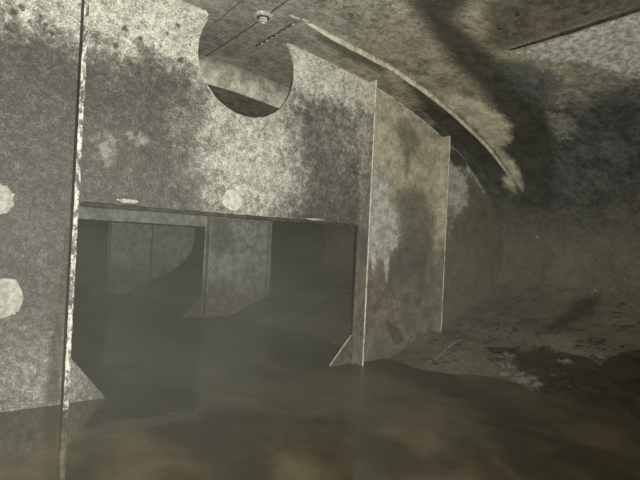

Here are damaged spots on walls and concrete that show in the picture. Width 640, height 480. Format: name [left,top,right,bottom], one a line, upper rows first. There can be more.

damp [324,39,382,71]
damp [413,0,640,238]
damp [369,163,431,289]
damp [486,346,640,420]